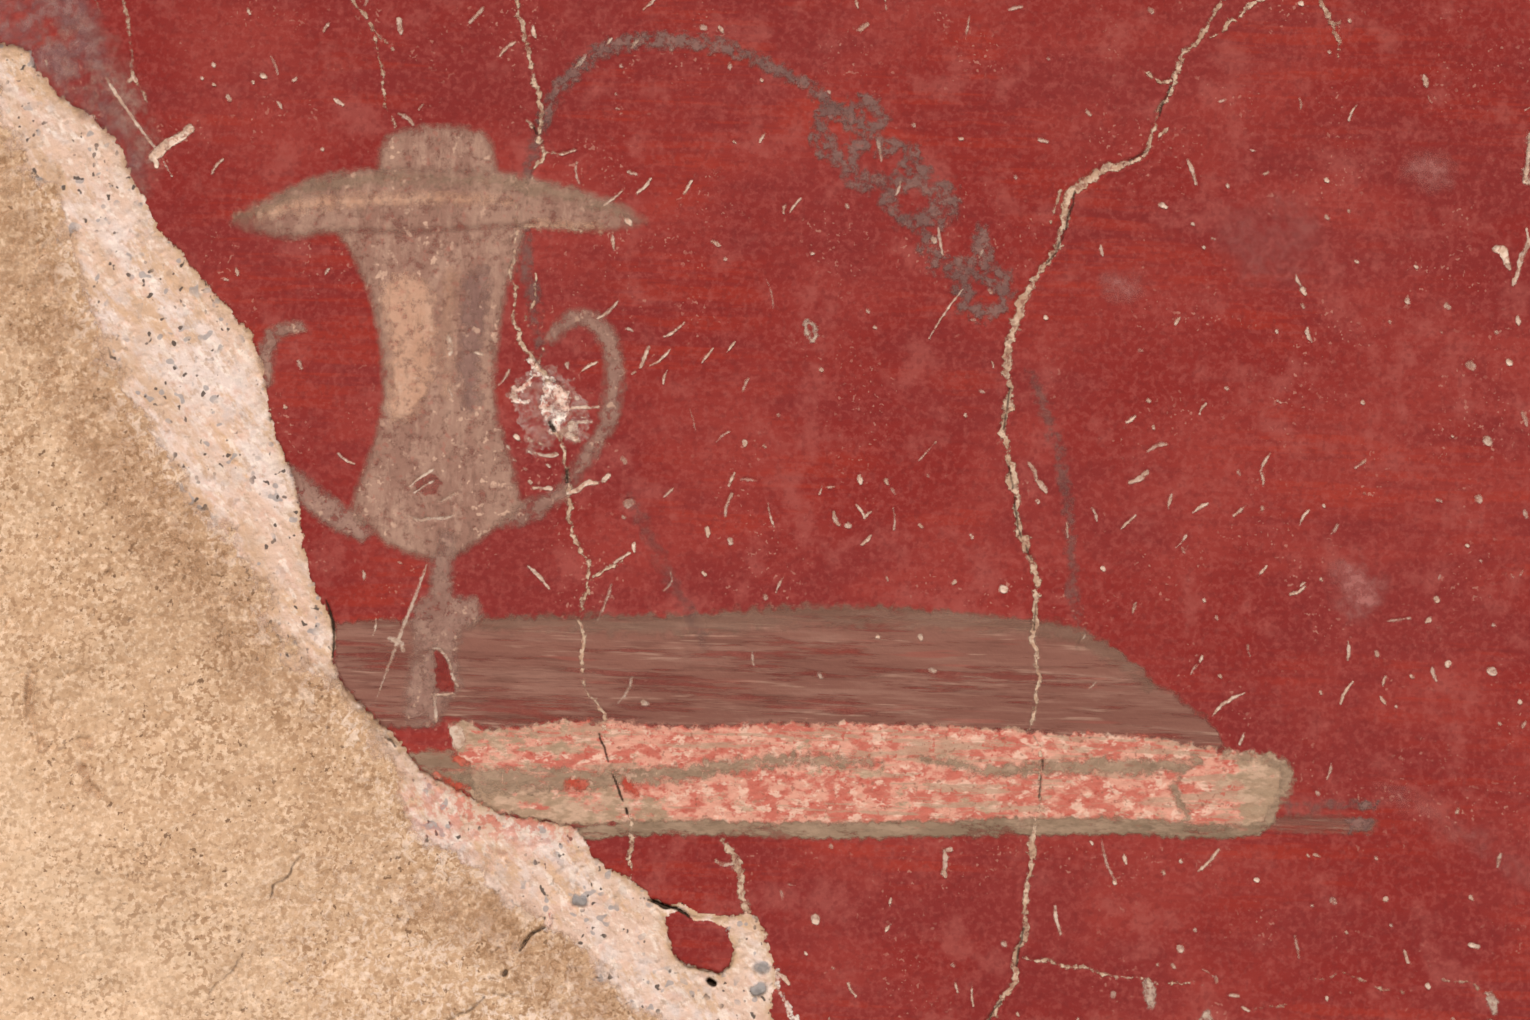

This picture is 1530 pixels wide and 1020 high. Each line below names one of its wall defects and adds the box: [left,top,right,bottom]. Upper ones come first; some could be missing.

crack [508,0,583,384]
crack [1320,1,1341,57]
spalling [0,42,778,1020]
crack [551,427,690,918]
crack [987,0,1265,1020]
crack [775,968,799,1020]